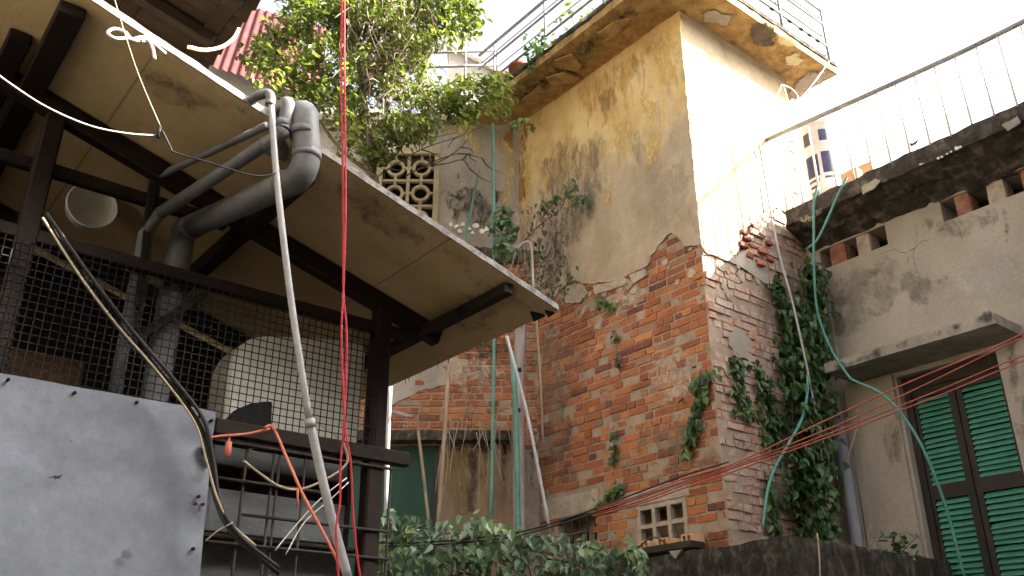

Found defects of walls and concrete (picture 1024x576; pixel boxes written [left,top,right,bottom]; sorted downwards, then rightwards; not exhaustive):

spalling [703,10,733,26]
peeling [523,53,581,104]
spalling [750,22,833,100]
water stain [446,176,510,227]
water stain [542,141,600,283]
peeling [564,269,648,304]
peeling [662,258,696,285]
spalling [717,223,774,321]